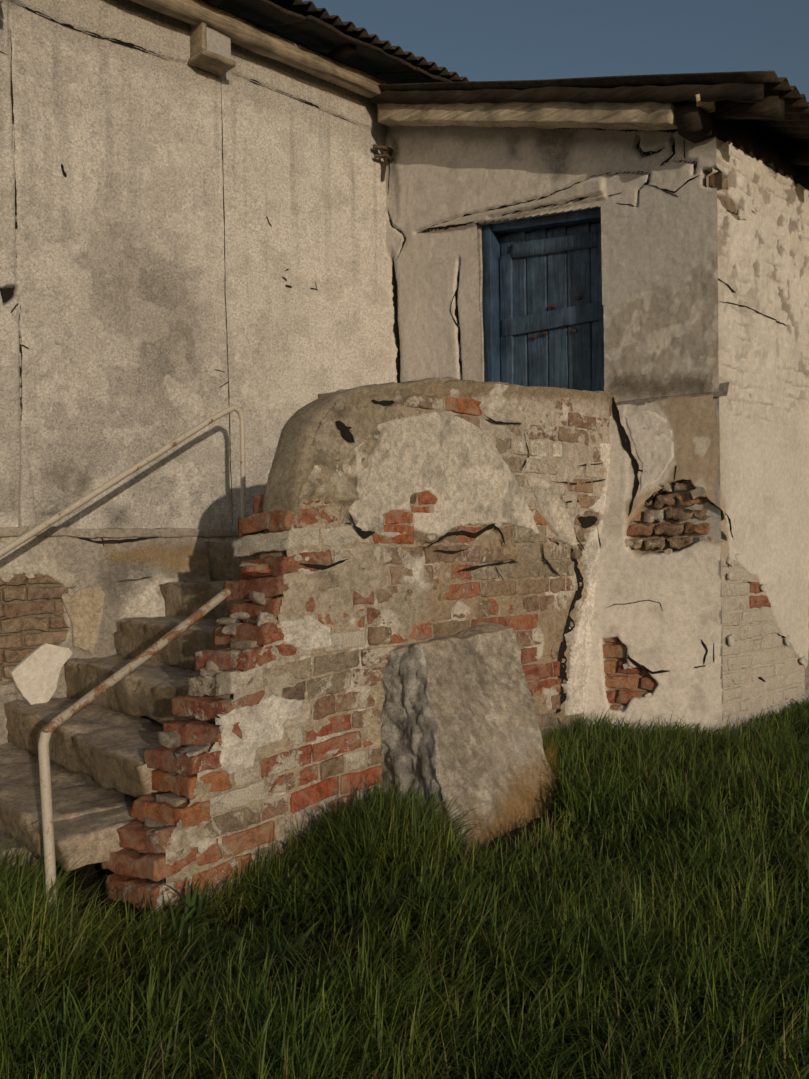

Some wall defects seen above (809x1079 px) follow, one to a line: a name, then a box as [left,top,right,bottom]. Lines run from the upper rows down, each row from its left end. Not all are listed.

flaking render [0,287,15,303]
crack [0,1,167,428]
crack [214,74,357,493]
crack [388,138,700,383]
crack [718,278,788,327]
crack [484,415,530,469]
crack [552,463,605,485]
flaking render [624,411,714,554]
crack [611,393,733,538]
flaking render [0,572,105,696]
peeling [349,411,657,716]
flaking render [694,553,808,735]